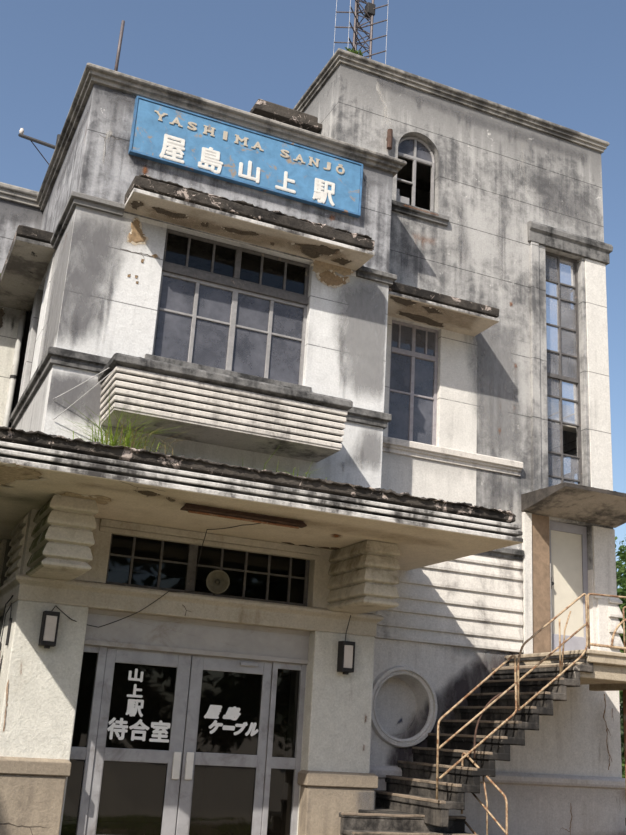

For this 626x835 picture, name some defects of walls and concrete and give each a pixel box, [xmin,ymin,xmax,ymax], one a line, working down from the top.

spalling [127,201,188,245]
peeling [221,227,258,236]
peeling [290,242,354,288]
water stain [42,219,120,359]
peeling [388,294,445,329]
peeling [0,463,49,488]
water stain [389,651,523,766]
crack [603,694,612,770]